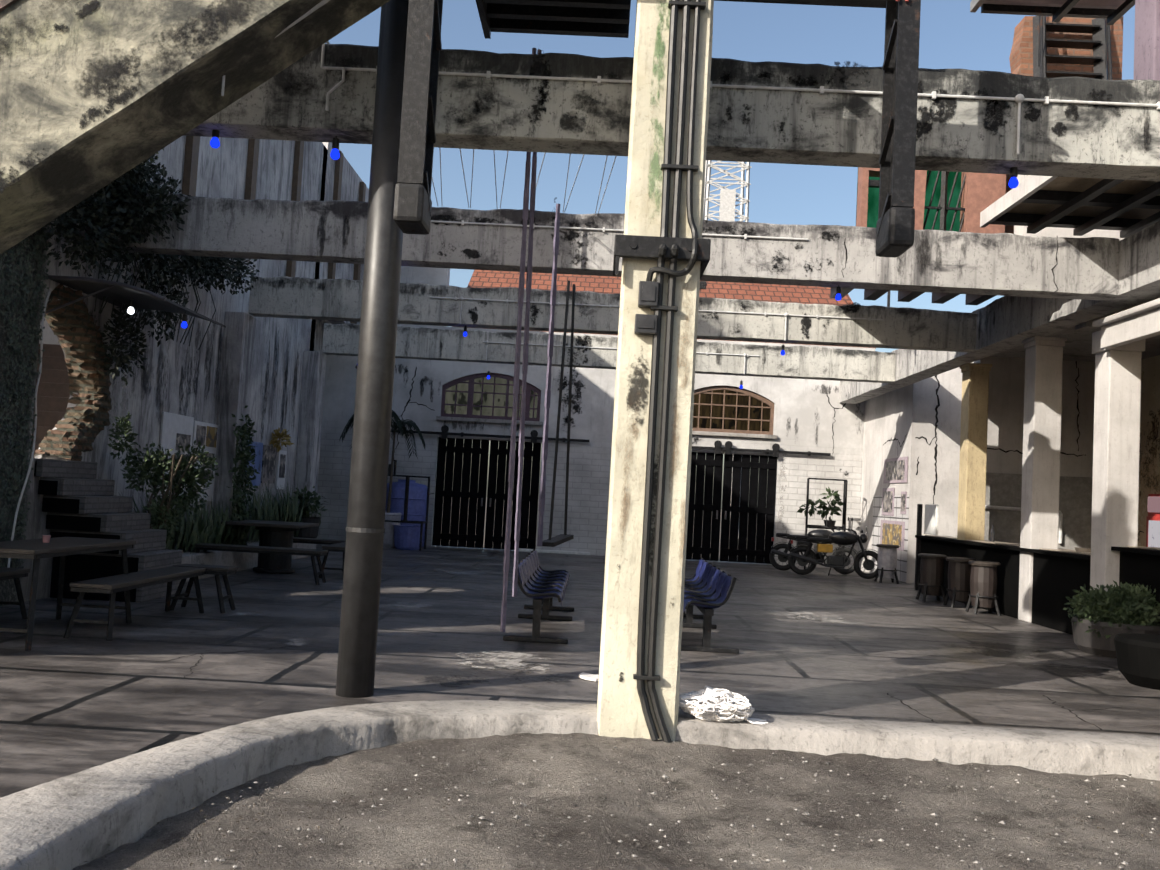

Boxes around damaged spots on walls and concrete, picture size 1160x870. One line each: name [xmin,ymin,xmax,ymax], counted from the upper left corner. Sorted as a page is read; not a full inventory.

leakage [0,0,99,62]
leakage [78,0,253,129]
leakage [507,50,551,133]
leakage [560,92,604,132]
leakage [916,81,1041,141]
leakage [1051,105,1079,137]
leakage [1087,89,1120,116]
leakage [770,243,803,272]
crack [394,367,435,453]
crack [883,375,940,504]
crack [1060,361,1086,457]
peeling [1139,410,1160,496]